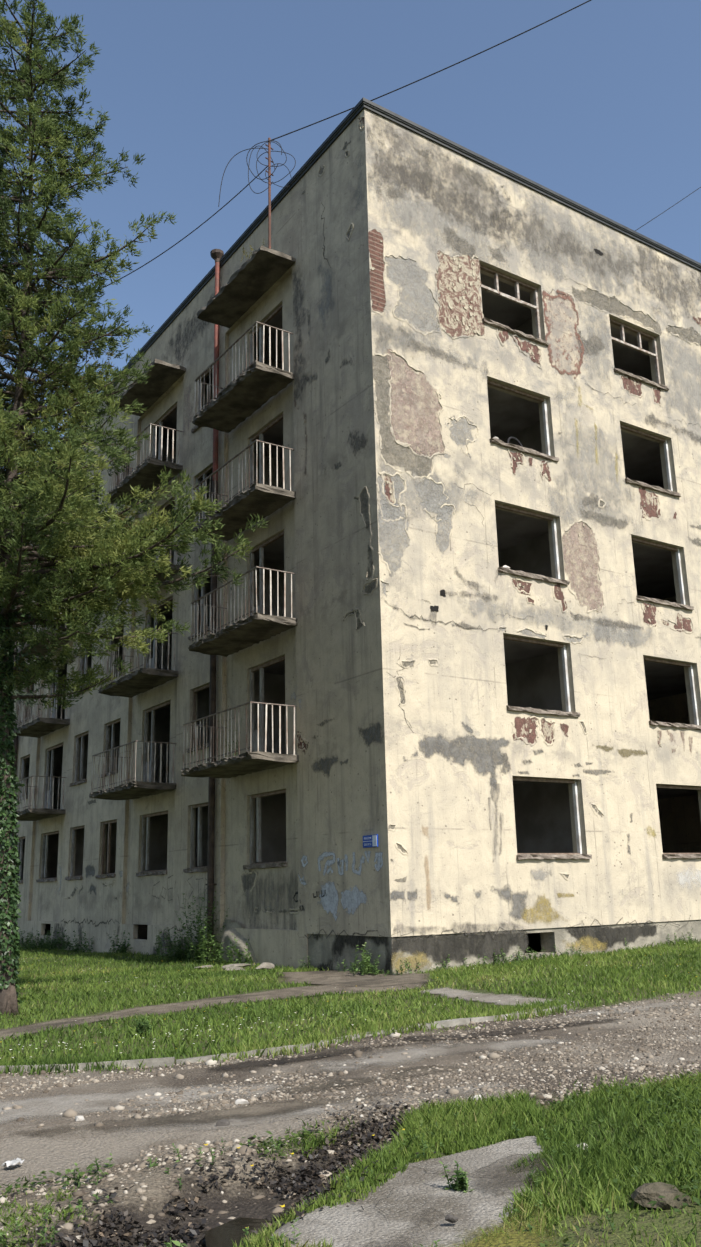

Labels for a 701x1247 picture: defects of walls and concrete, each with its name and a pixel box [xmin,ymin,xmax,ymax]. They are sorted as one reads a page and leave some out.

peeling [368,229,701,379]
peeling [619,374,661,406]
peeling [507,448,551,481]
peeling [343,349,480,629]
peeling [639,487,677,521]
peeling [552,519,605,613]
peeling [512,578,534,605]
spalling [498,625,588,645]
peeling [511,715,587,747]
water stain [405,722,543,829]
water stain [308,888,528,974]
water stain [566,923,656,951]